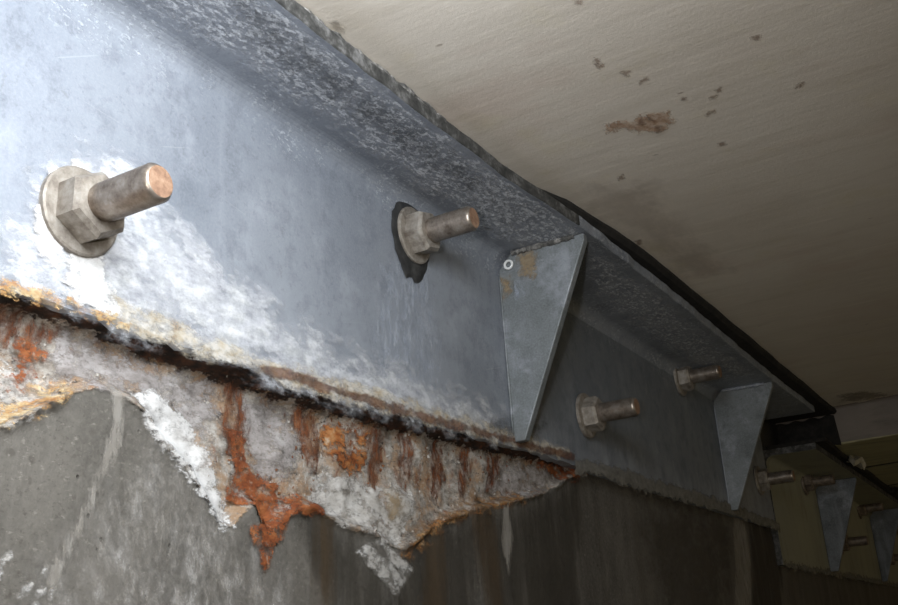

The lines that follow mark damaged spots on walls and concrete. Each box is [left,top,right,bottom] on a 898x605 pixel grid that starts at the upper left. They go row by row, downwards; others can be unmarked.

corrosion [0,278,131,331]
corrosion [222,380,325,573]
spalling [0,303,588,594]
corrosion [262,366,575,460]